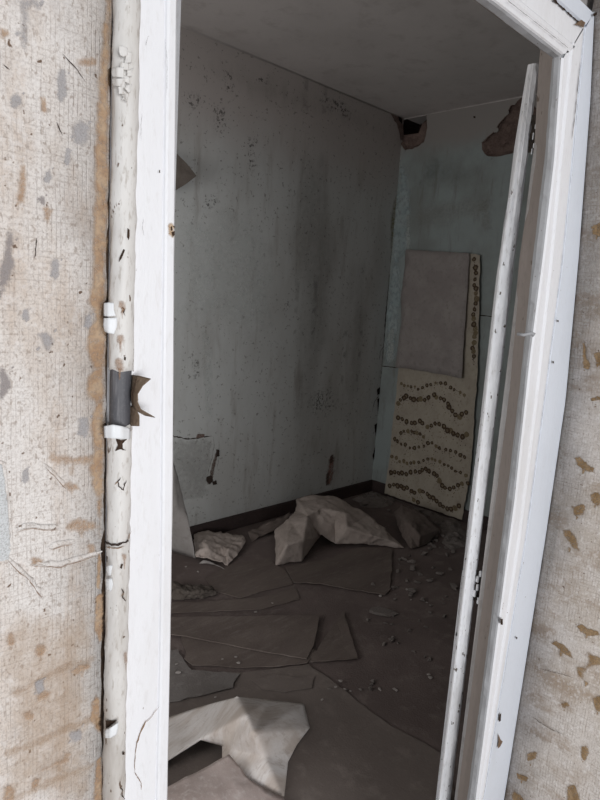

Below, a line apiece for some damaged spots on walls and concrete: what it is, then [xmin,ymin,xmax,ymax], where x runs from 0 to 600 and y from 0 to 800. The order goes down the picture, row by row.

flaking render [391,114,427,153]
flaking render [479,98,522,160]
crack [98,12,130,773]
crack [120,712,155,799]